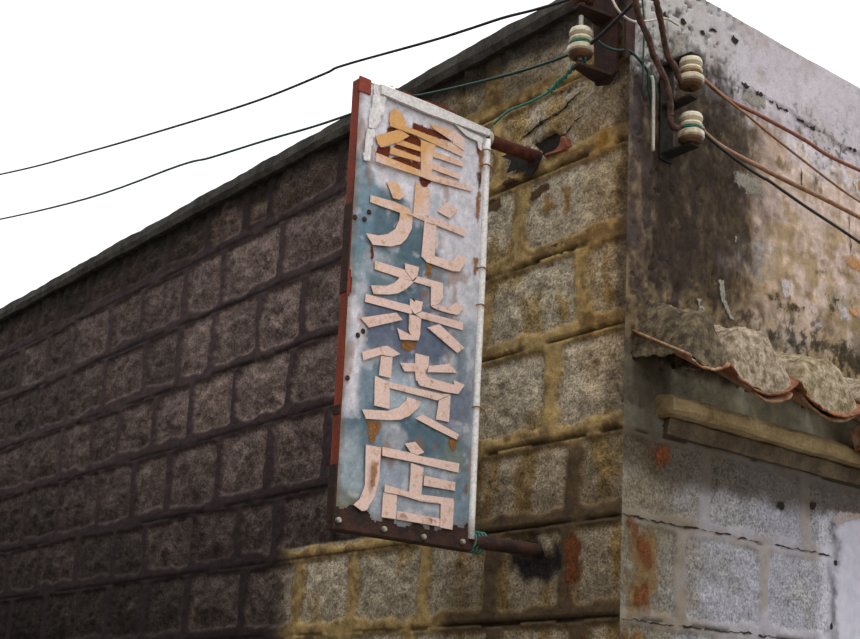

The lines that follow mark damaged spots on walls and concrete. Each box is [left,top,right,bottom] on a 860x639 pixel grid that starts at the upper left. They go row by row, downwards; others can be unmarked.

crack [521,90,583,138]
water stain [645,31,751,320]
rust [563,532,582,584]
rust [627,515,657,614]
crack [623,513,831,557]
crack [621,618,786,639]